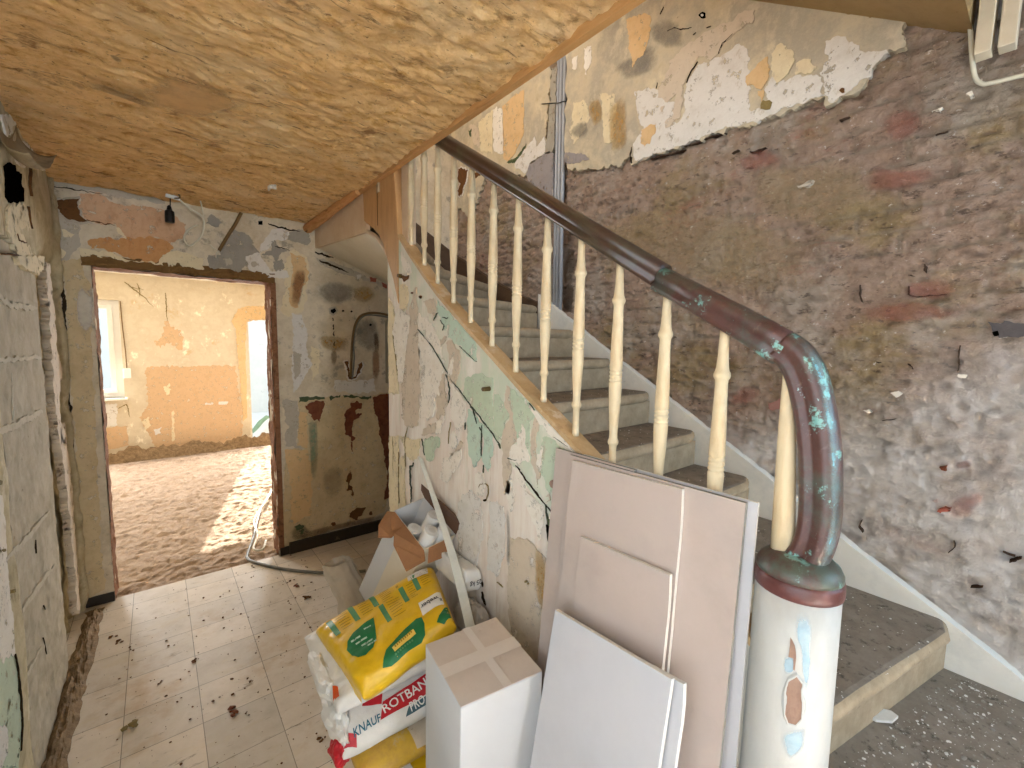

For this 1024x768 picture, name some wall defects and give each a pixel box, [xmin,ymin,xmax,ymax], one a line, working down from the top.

peeling [626,13,651,68]
peeling [640,10,755,147]
peeling [745,43,817,110]
flaking render [207,229,311,317]
peeling [154,321,184,350]
peeling [1,162,129,615]
peeling [283,357,454,547]
crack [409,439,425,503]
crack [417,313,551,512]
peeling [513,467,550,541]
peeling [516,388,572,451]
peeling [781,637,807,727]